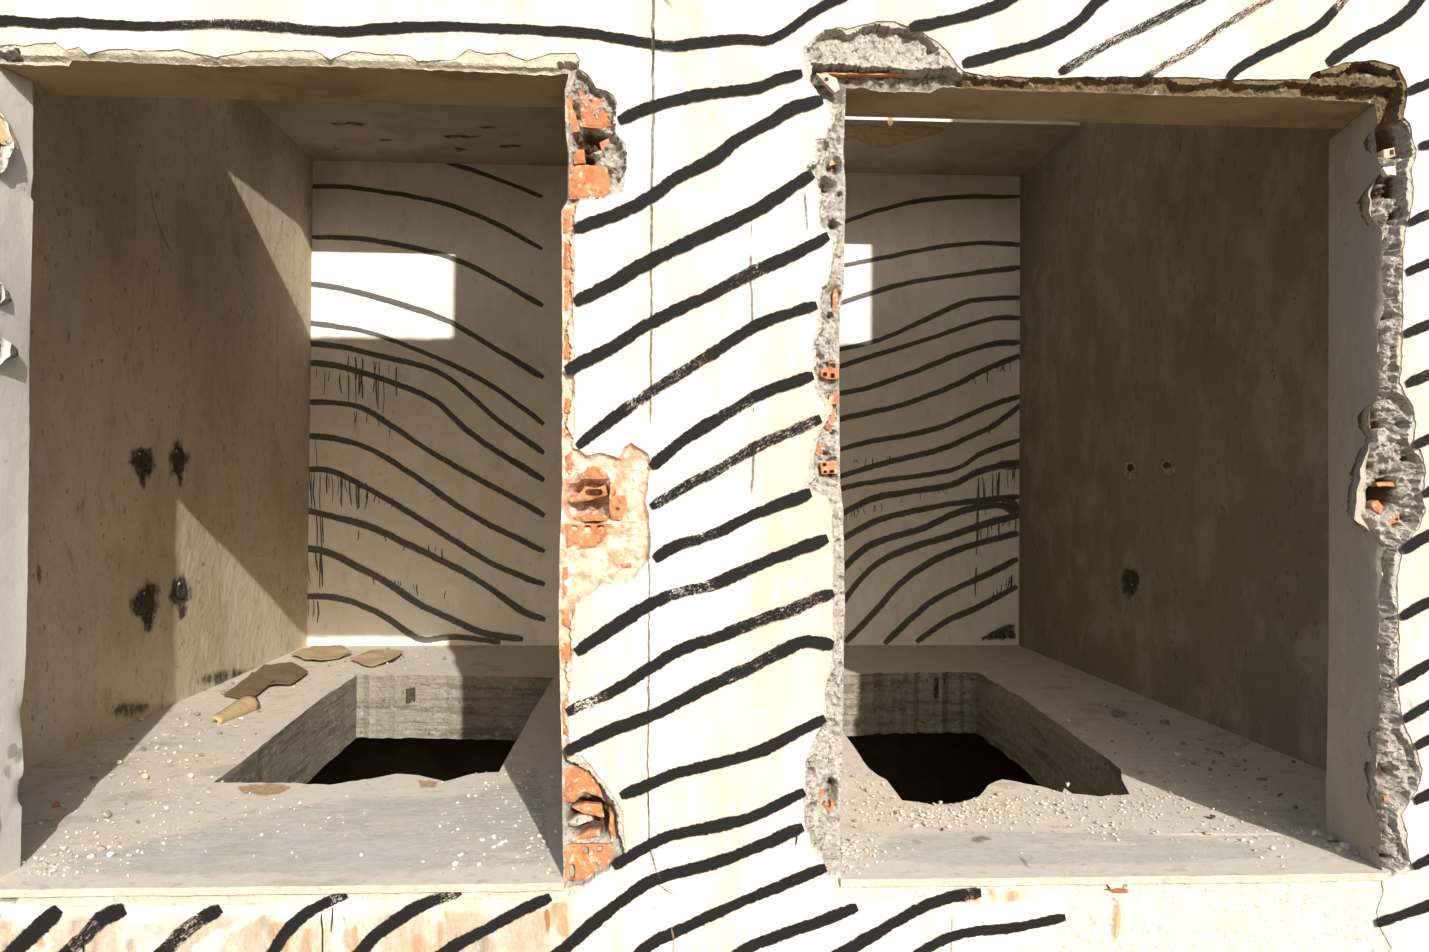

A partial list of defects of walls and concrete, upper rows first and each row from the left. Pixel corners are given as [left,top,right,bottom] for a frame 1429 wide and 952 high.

flaking render [0,43,651,952]
crack [647,532,676,952]
flaking render [801,21,1426,952]